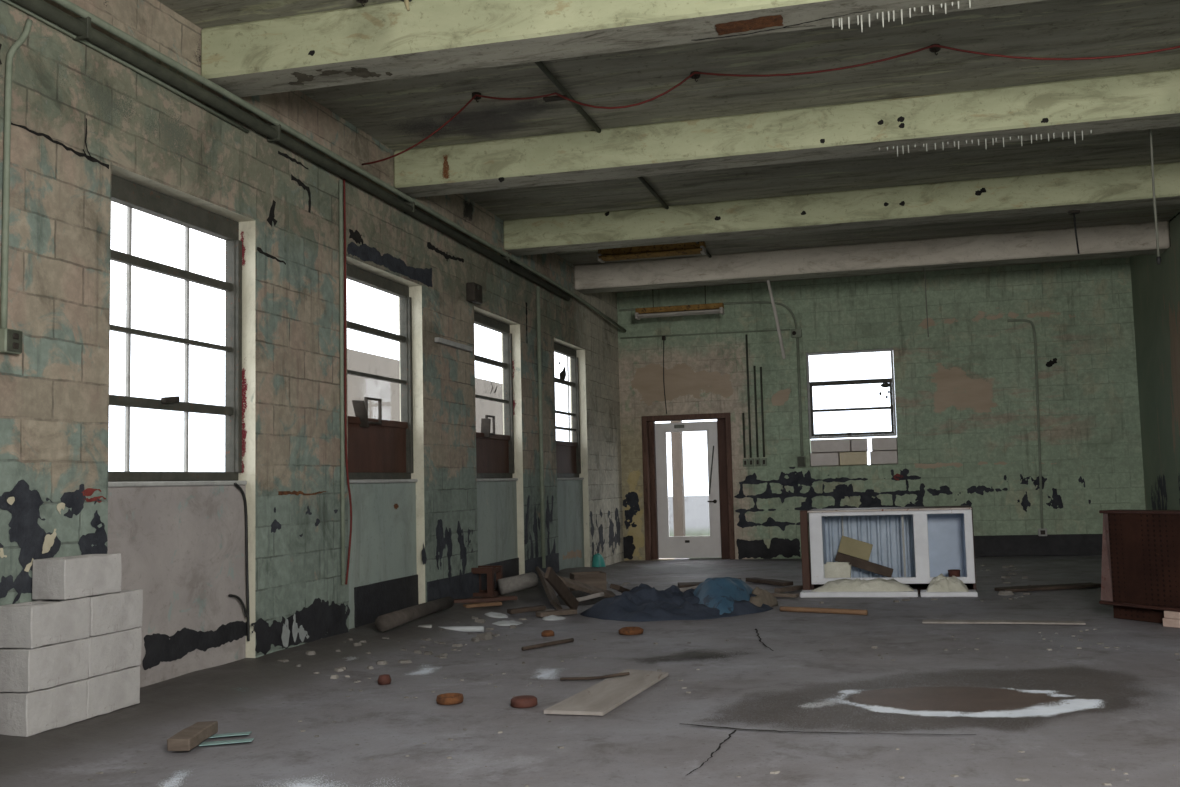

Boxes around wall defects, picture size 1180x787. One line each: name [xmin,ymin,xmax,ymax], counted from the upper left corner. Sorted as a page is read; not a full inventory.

crack [11,118,109,169]
peeling [349,229,363,245]
peeling [0,480,108,604]
peeling [734,467,1063,559]
peeling [142,598,350,670]
damp [687,665,1179,735]
crack [680,723,851,775]